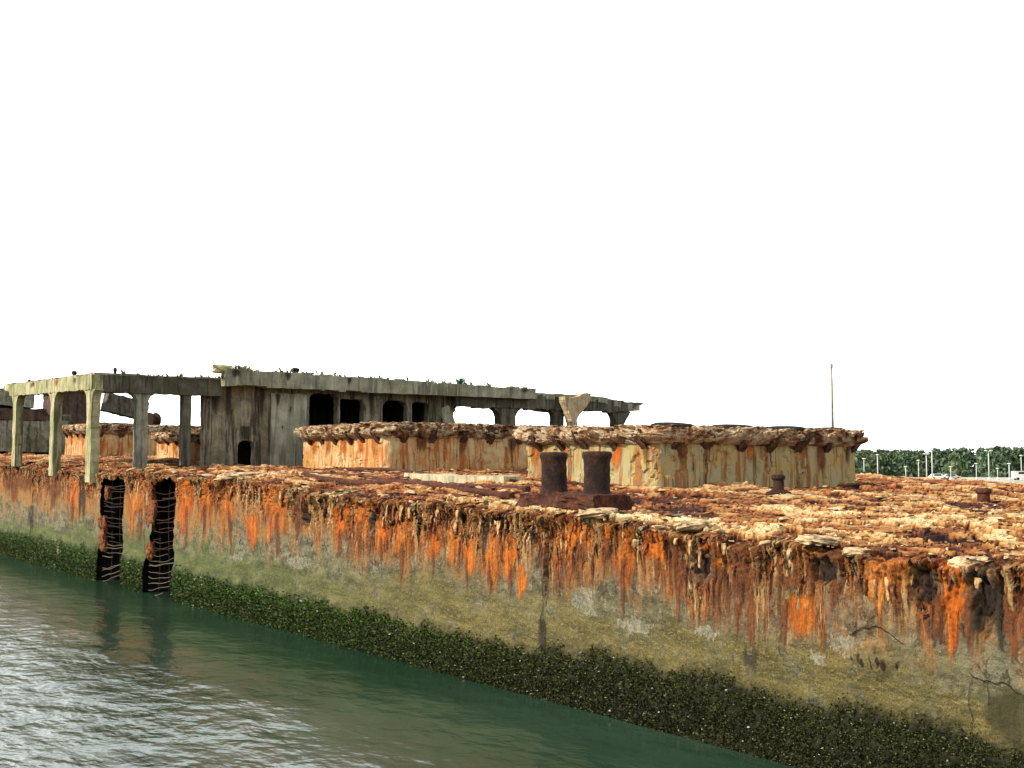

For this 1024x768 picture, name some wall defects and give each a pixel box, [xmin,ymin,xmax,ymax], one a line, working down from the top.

corrosion [300,438,531,500]
spalling [96,475,142,584]
spalling [142,478,176,597]
corrosion [429,528,528,600]
corrosion [558,523,687,626]
water stain [617,612,652,637]
spalling [622,531,733,584]
spalling [770,548,847,586]
water stain [811,628,855,666]
corrosion [865,556,909,615]
water stain [968,564,1005,649]
water stain [984,694,1024,746]